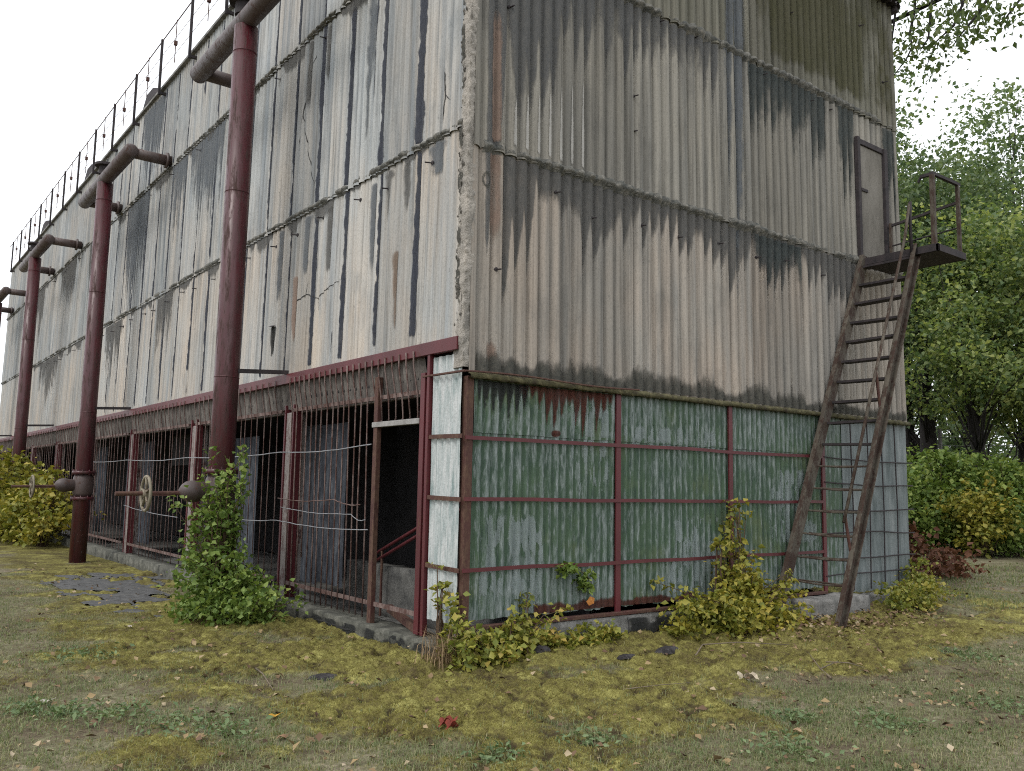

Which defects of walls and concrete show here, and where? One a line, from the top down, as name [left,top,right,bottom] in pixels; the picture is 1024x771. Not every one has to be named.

leakage [120,81,226,401]
leakage [289,124,297,217]
leakage [275,0,324,202]
leakage [259,151,347,377]
leakage [344,109,352,185]
leakage [350,0,410,345]
leakage [409,229,419,336]
leakage [414,51,445,174]
rust [490,18,502,233]
leakage [482,0,862,304]
leakage [478,380,529,417]
rust [521,385,613,437]